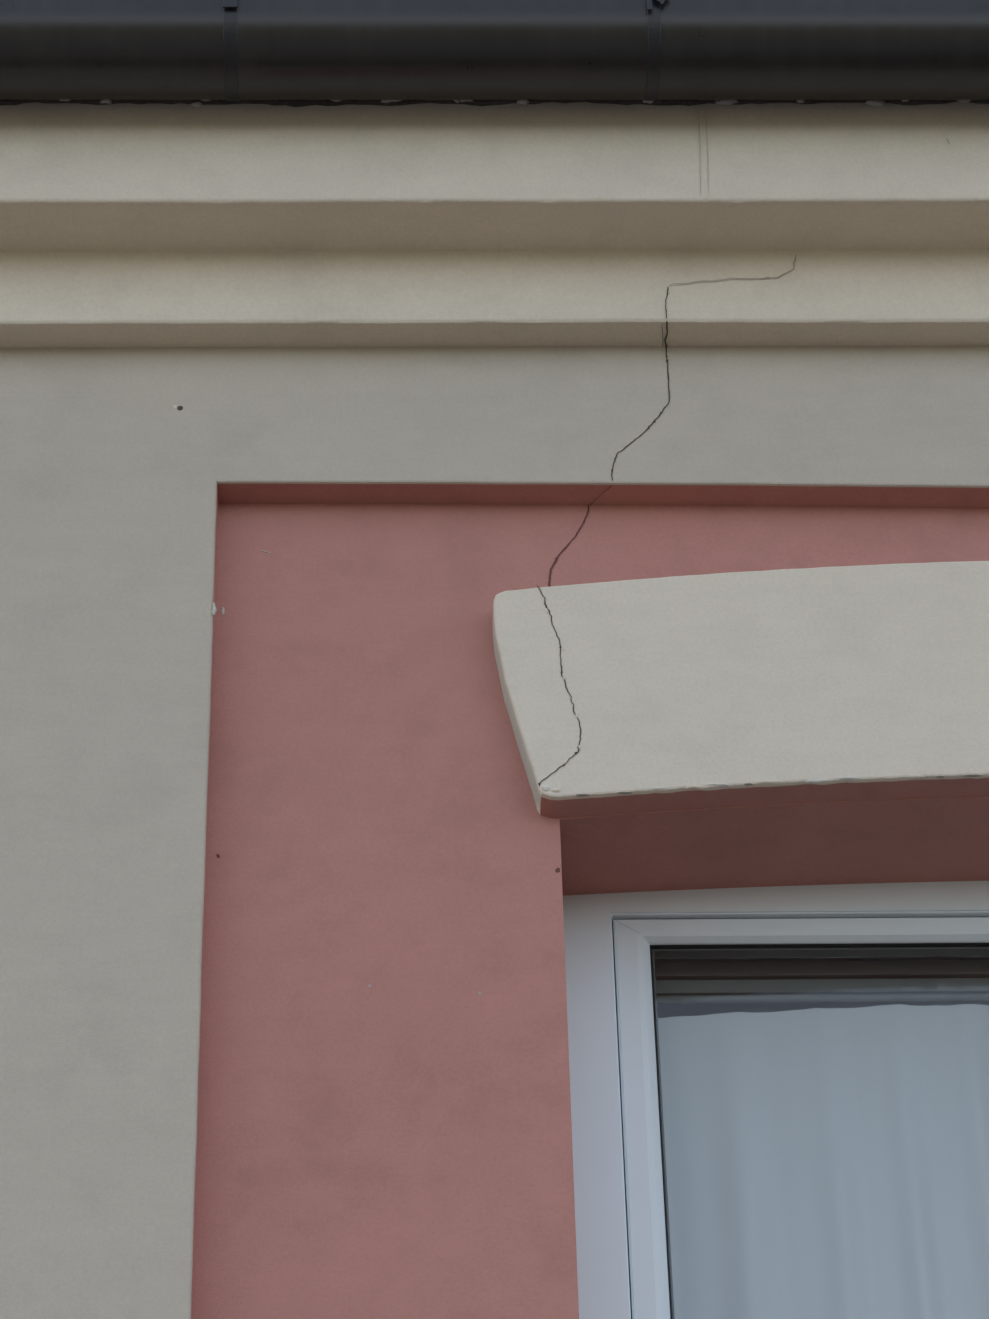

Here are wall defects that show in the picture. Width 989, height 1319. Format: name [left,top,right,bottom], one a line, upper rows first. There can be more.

crack [536,255,796,783]